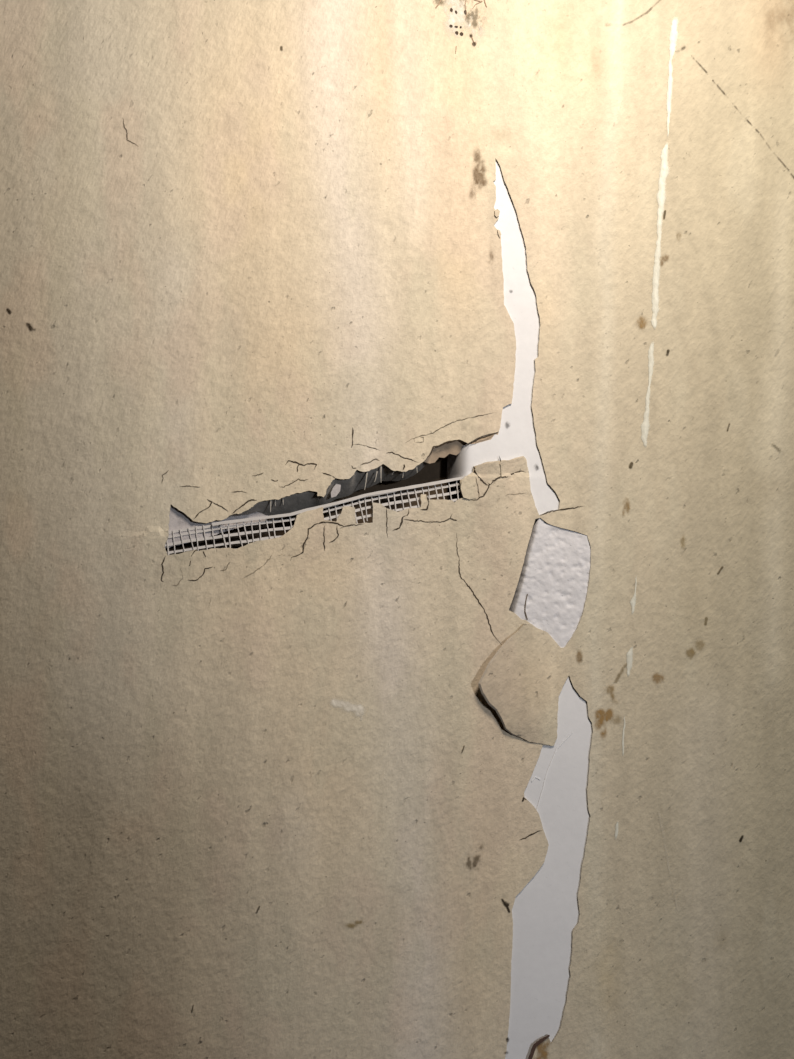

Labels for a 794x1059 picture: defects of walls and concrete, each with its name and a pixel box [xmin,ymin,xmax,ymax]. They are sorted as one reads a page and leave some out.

crack [161,413,524,639]
peeling [447,159,592,1059]